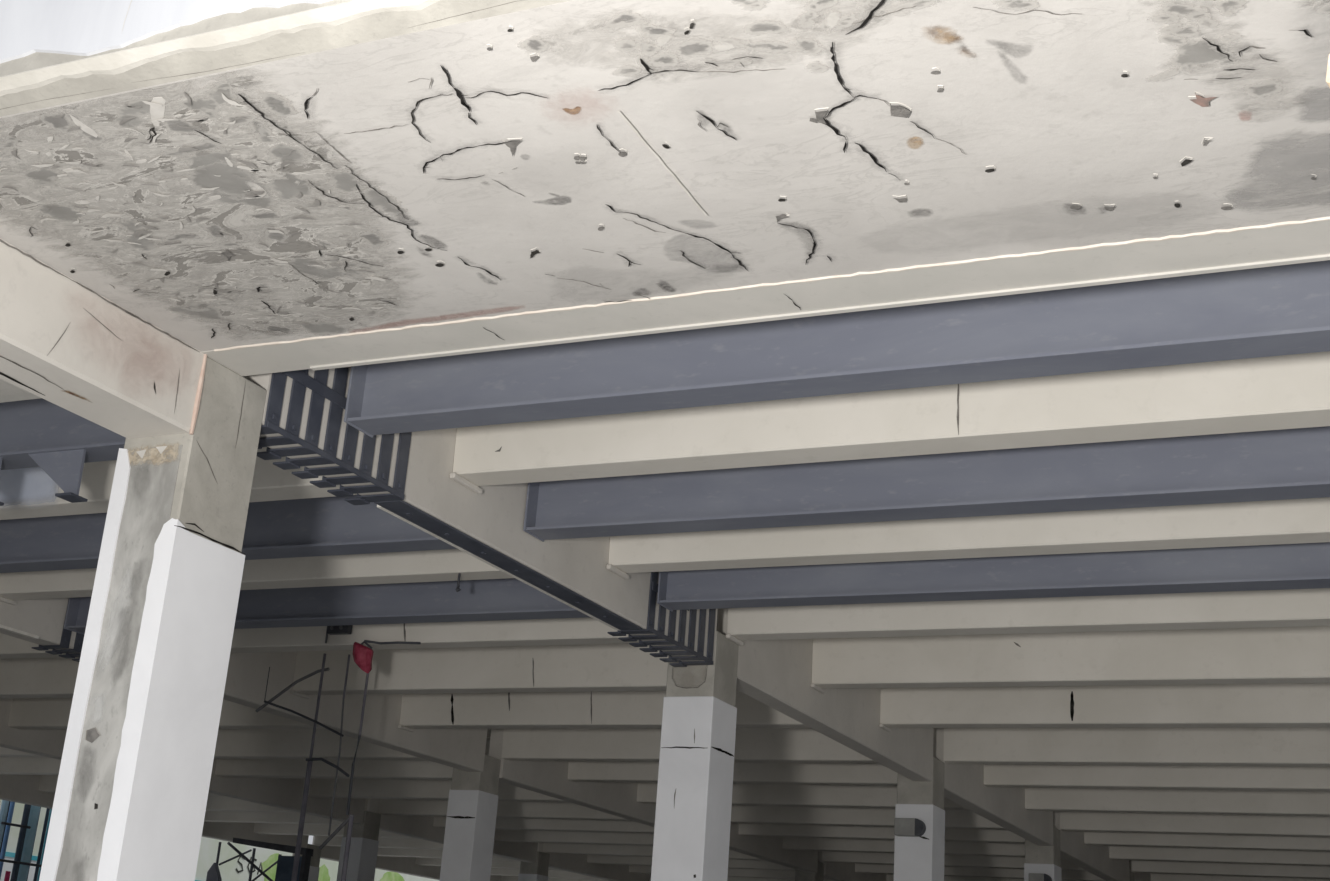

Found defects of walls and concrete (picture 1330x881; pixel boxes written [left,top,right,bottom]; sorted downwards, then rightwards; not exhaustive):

crack [409,0,523,28]
crack [974,7,1076,15]
crack [823,0,965,176]
crack [697,111,736,140]
crack [0,52,546,278]
peeling [0,72,407,337]
crack [605,204,748,271]
crack [778,223,832,263]
crack [0,227,231,413]
crack [1068,691,1076,721]
crack [661,729,734,757]